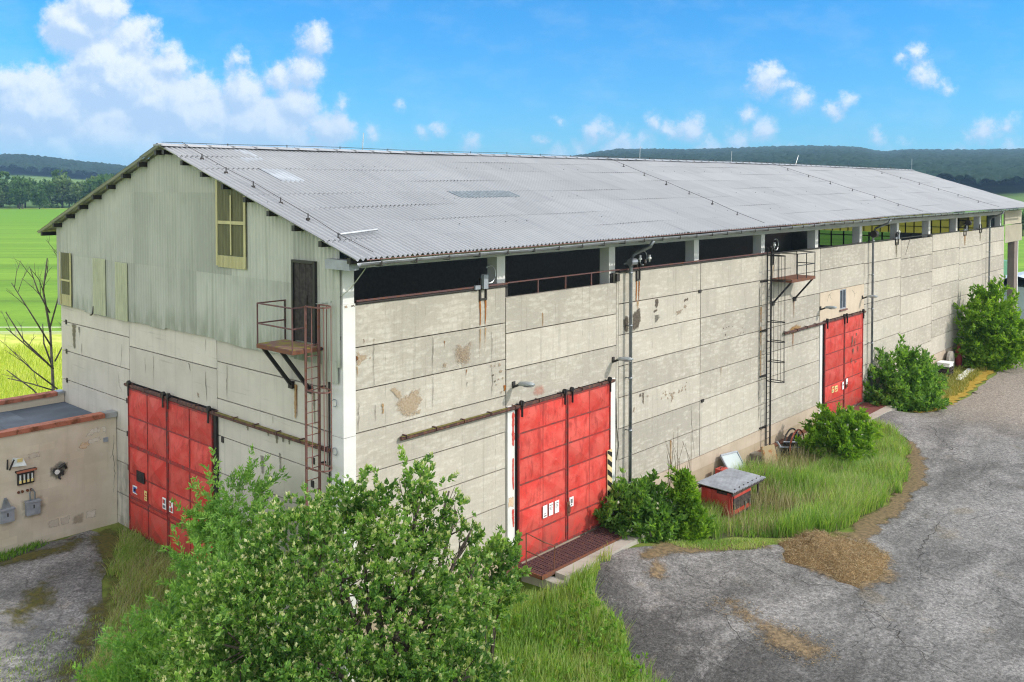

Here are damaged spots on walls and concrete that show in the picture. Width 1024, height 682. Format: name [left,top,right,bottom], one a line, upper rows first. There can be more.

damp [624,308,641,331]
peeling [443,343,471,367]
peeling [391,388,421,415]